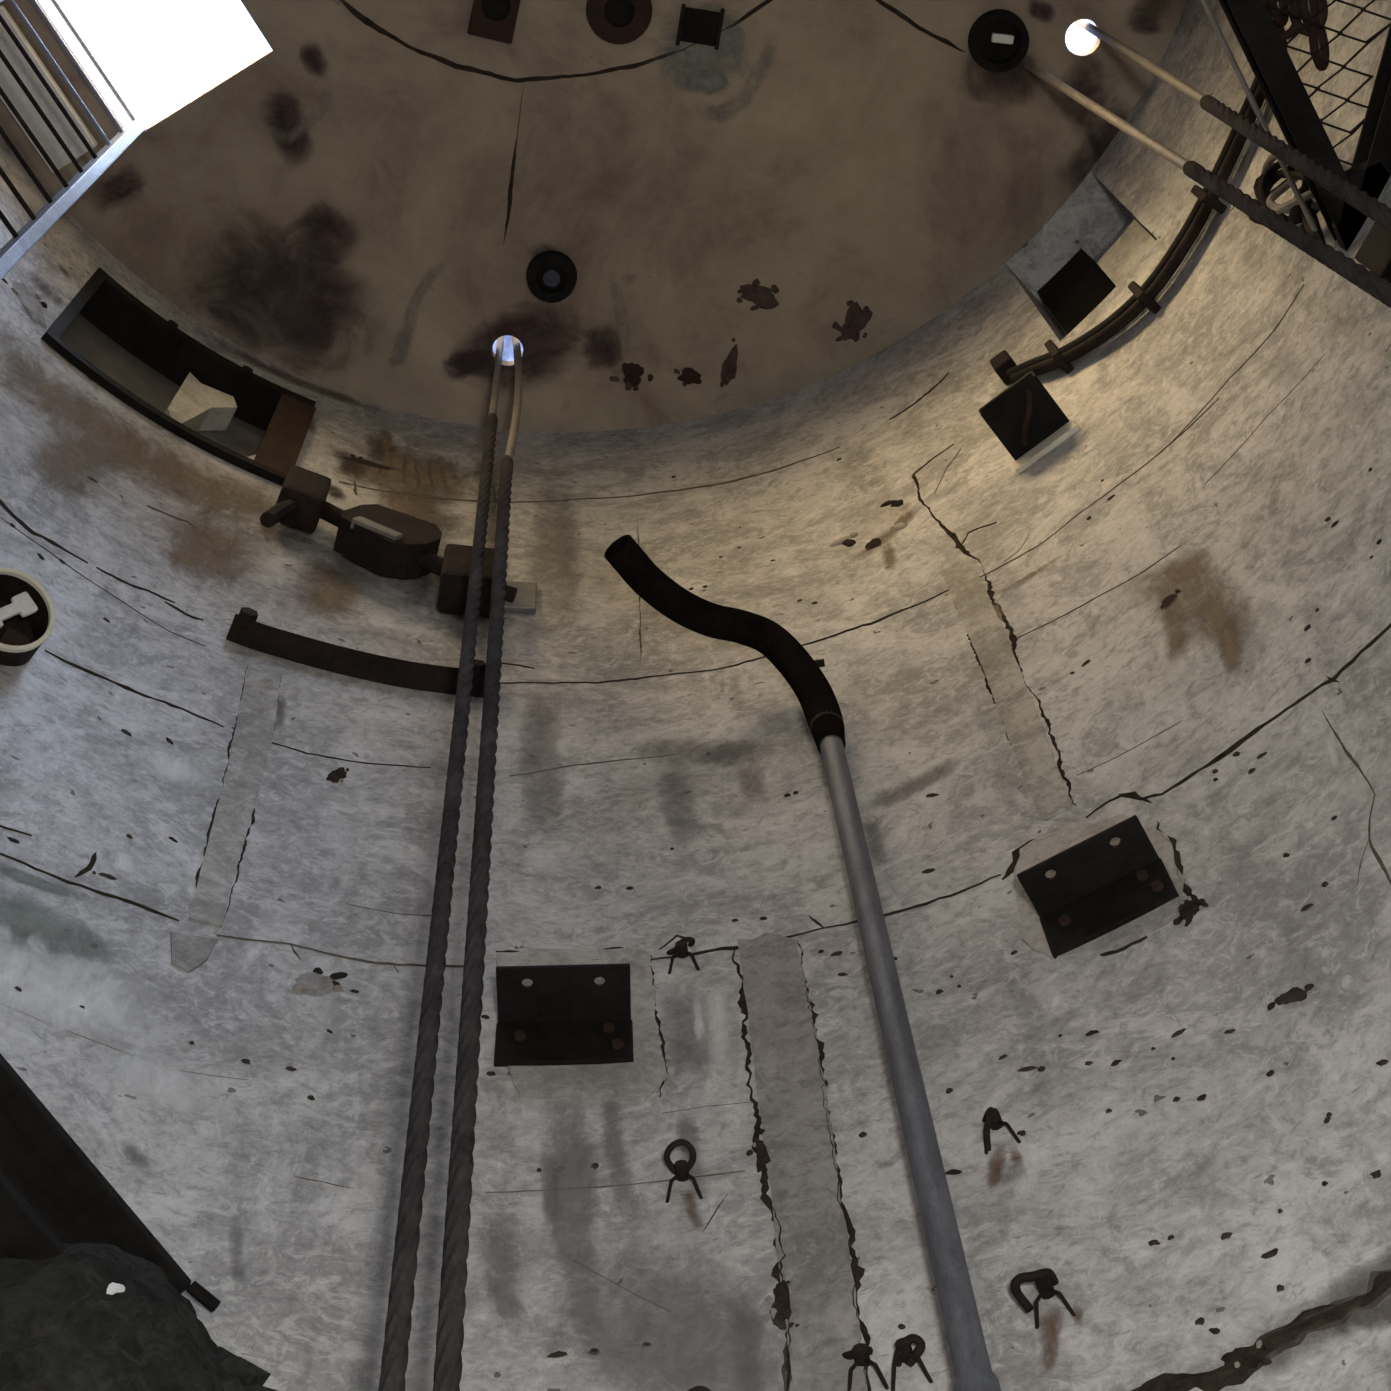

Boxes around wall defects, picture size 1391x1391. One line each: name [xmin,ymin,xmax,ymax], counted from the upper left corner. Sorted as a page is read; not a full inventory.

water stain [102,173,141,204]
water stain [200,207,359,404]
peeling [736,279,779,311]
peeling [832,300,873,342]
crack [912,284,1304,577]
crack [0,499,206,647]
crack [802,590,949,646]
spalling [195,668,247,887]
crack [1076,623,1391,886]
spalling [170,808,255,973]
water stain [574,1290,759,1391]
crack [1131,1271,1391,1391]